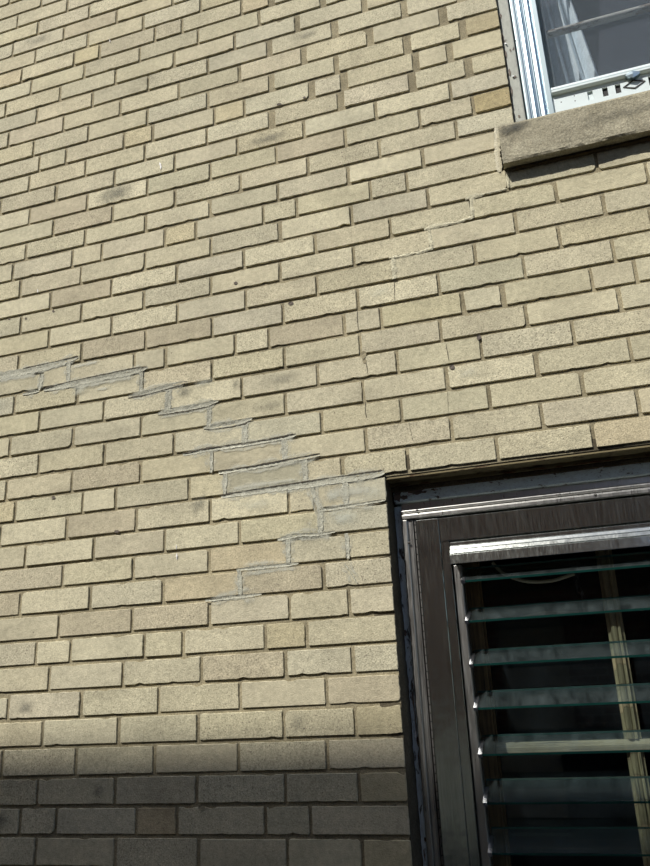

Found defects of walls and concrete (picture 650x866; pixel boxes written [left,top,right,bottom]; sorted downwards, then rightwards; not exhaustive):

crack [0,354,385,604]